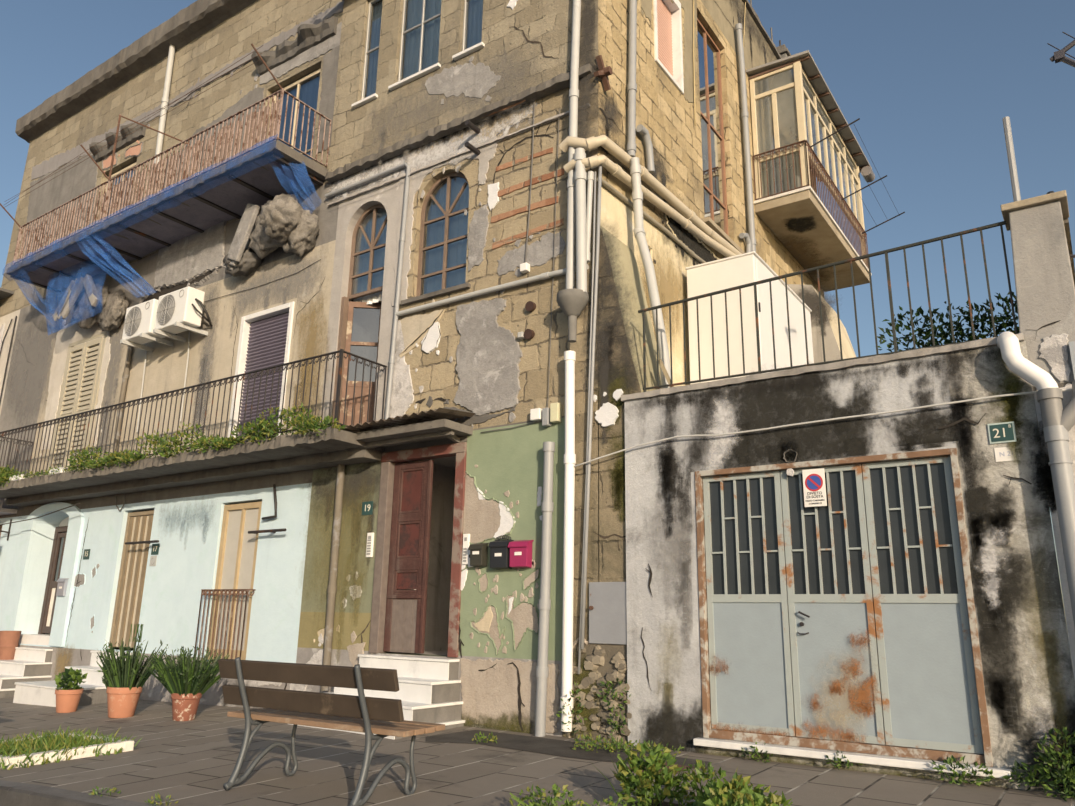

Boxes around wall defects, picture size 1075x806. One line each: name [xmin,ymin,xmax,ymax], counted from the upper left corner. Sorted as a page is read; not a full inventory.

flaking render [425,56,526,119]
crack [509,26,553,58]
flaking render [391,136,566,307]
flaking render [389,289,523,428]
spalling [462,465,519,545]
peeling [593,389,623,402]
damp [645,349,1027,734]
damp [1003,383,1057,512]
flaking render [460,559,632,744]
rust [831,632,876,716]